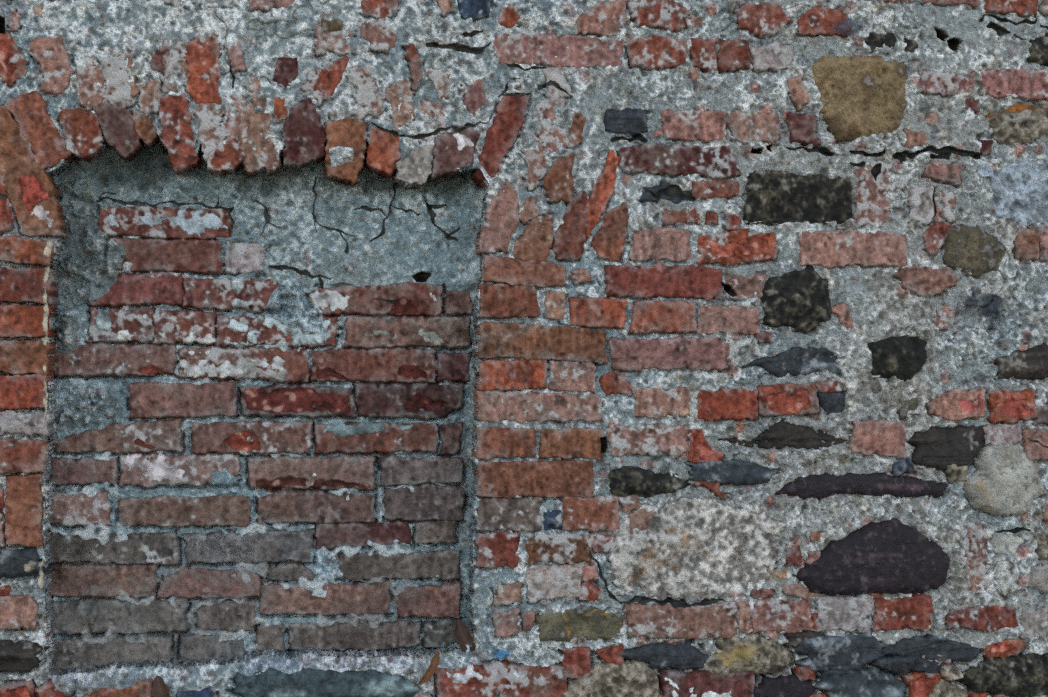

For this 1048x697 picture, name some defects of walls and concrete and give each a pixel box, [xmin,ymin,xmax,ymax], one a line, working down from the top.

crack [786,145,983,181]
crack [312,177,460,254]
crack [930,185,938,223]
crack [269,265,333,289]